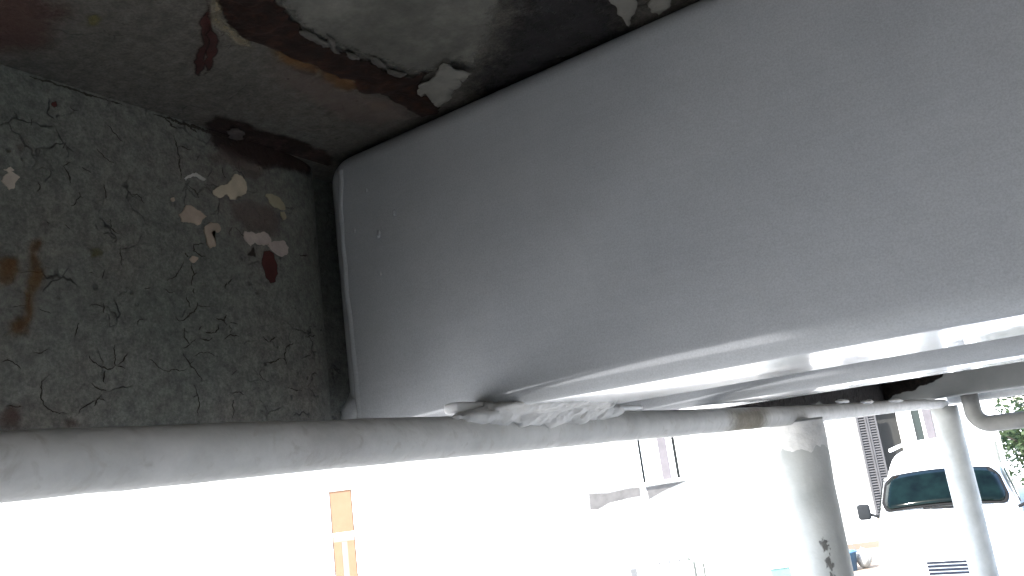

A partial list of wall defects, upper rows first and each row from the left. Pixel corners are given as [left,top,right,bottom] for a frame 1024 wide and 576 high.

corrosion [194,5,219,76]
peeling [218,0,501,117]
peeling [609,0,671,27]
crack [29,76,144,278]
peeling [184,173,247,200]
peeling [170,197,221,249]
peeling [243,231,289,257]
crack [3,243,314,418]